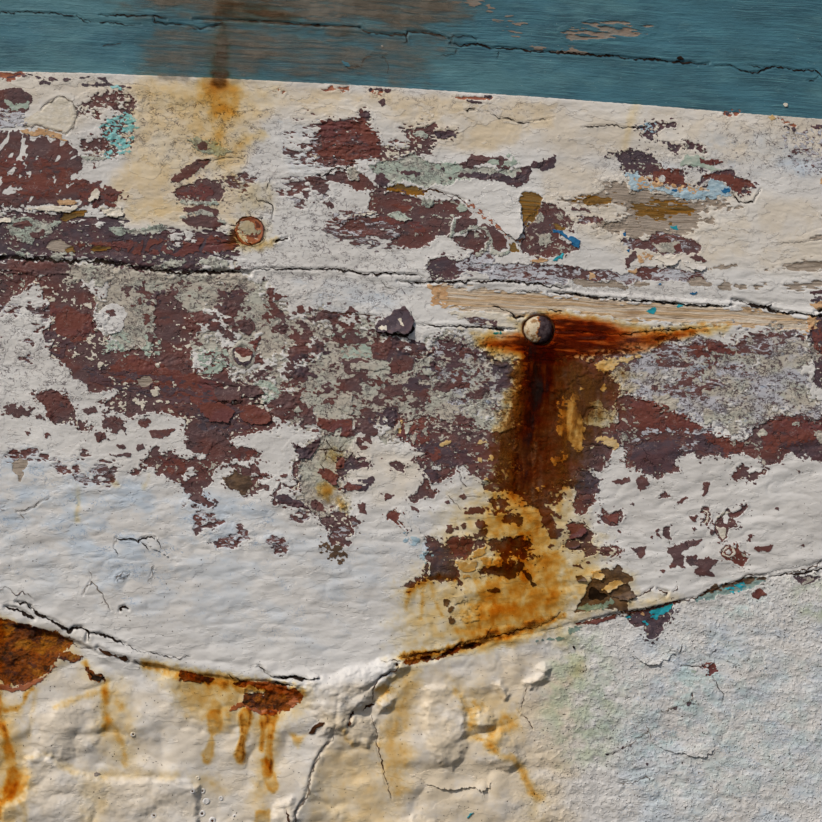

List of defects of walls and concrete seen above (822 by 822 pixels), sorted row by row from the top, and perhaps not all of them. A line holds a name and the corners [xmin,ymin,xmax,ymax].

water stain [146,0,468,75]
crack [1,10,822,81]
peeling [452,0,528,37]
peeling [529,21,653,55]
crack [210,178,288,245]
crack [0,254,822,336]
peeling [0,71,822,666]
corrosion [492,314,685,488]
crack [0,587,186,667]
crack [579,561,822,624]
crack [259,666,319,686]
crack [286,611,561,822]